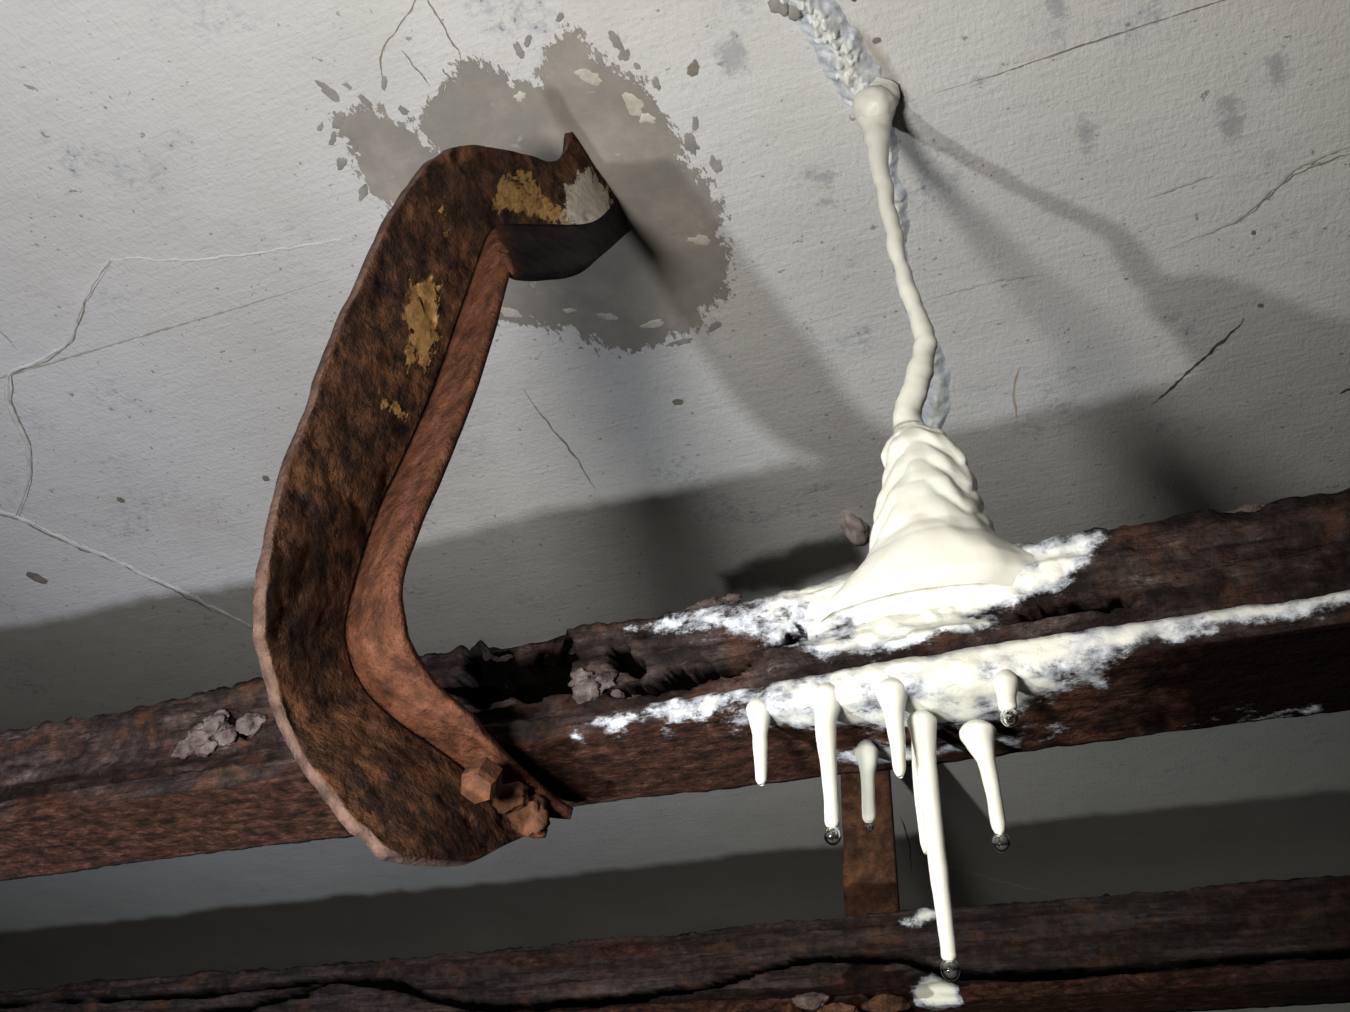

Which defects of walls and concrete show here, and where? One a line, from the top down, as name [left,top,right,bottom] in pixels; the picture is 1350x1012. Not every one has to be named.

spalling [315,12,742,359]
crack [0,239,341,629]
damp [725,537,861,593]